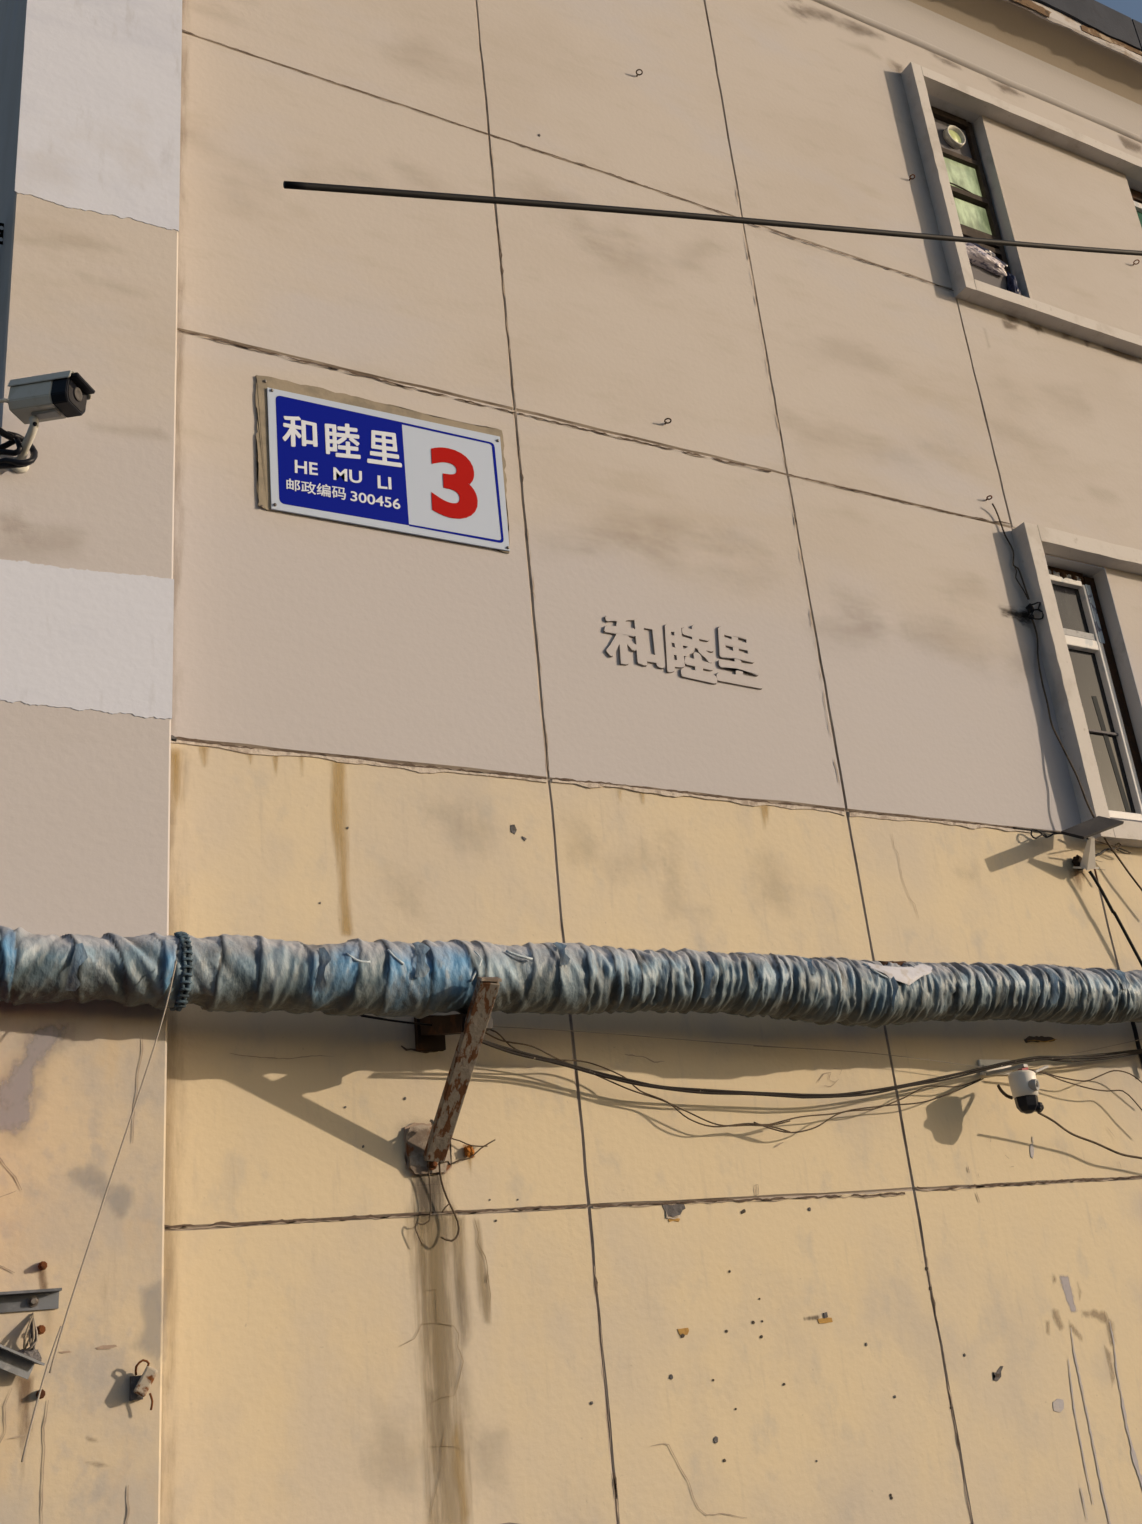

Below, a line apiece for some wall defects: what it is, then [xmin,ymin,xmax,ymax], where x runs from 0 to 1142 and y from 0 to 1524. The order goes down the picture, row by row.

crack [164,1130,1142,1300]
crack [0,1389,49,1524]
crack [403,1289,465,1514]
damp [416,1173,464,1522]
crack [594,1266,619,1520]
crack [652,1443,745,1518]
peeling [1047,1276,1142,1524]